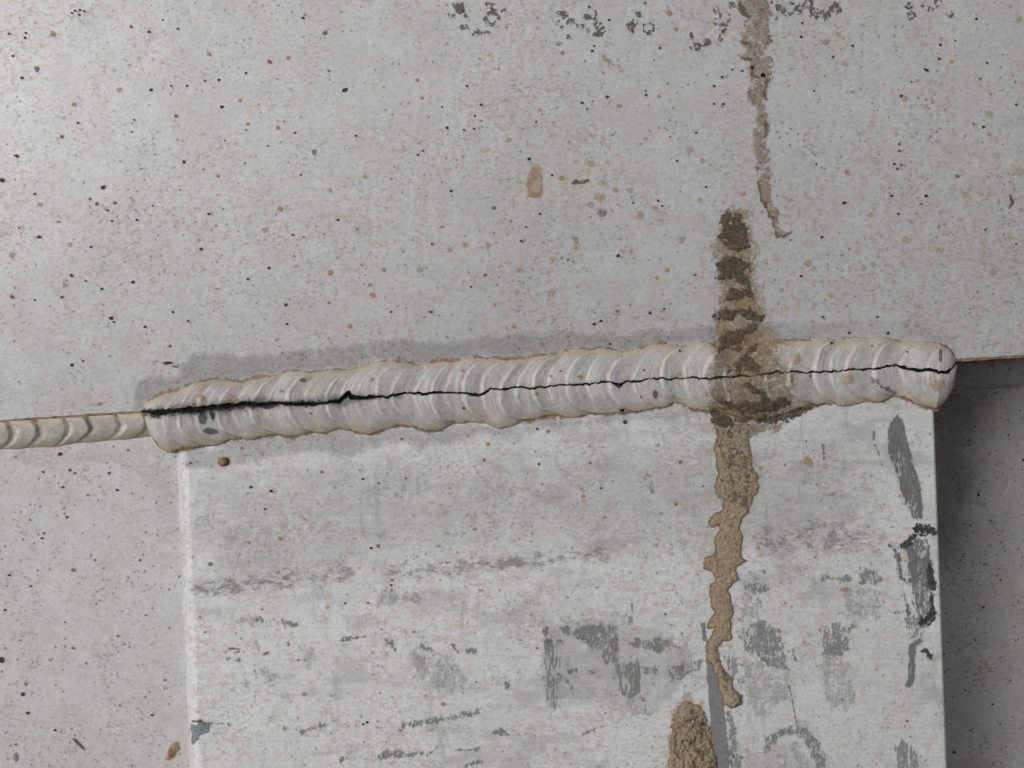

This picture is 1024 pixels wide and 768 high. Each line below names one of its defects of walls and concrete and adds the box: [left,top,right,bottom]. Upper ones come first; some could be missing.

crack [142,361,961,421]